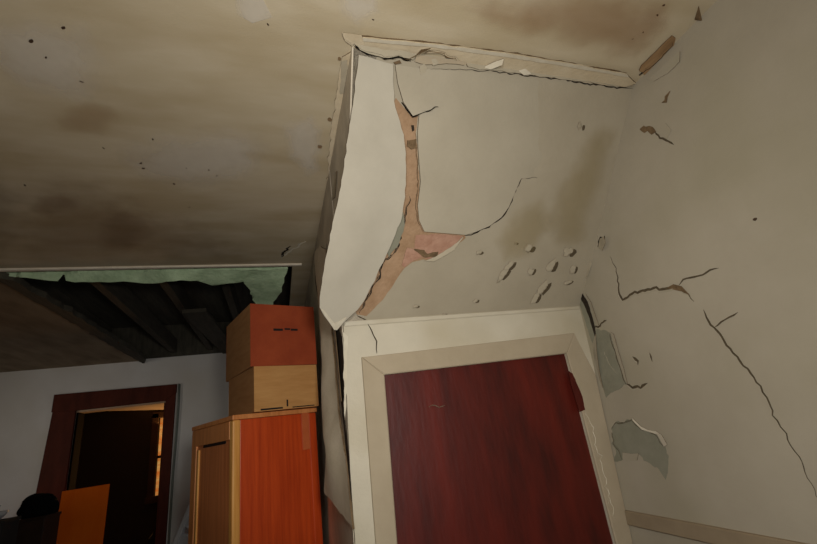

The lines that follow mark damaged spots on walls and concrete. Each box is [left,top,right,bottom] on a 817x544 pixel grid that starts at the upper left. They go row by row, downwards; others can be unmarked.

crack [353,44,627,89]
flaking render [319,32,636,330]
spalling [0,272,146,363]
peeling [593,329,628,397]
crack [610,256,817,497]
peeling [612,418,669,480]